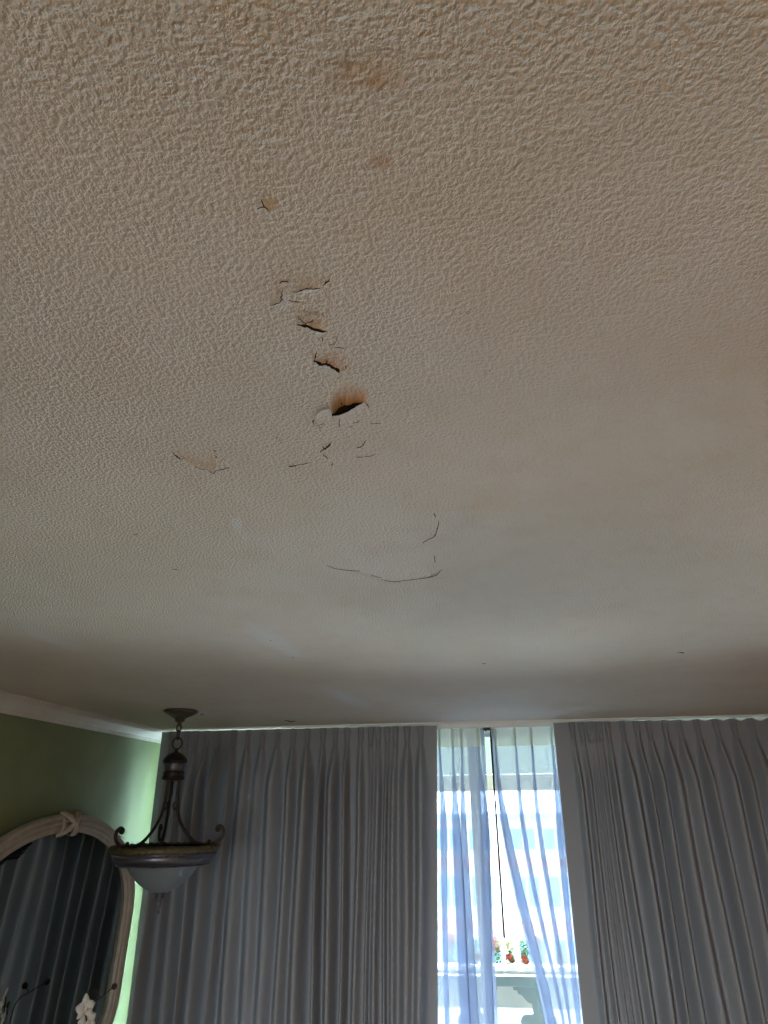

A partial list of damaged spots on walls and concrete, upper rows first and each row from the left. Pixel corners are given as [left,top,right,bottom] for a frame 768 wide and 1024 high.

peeling [263,277,358,378]
crack [324,513,450,583]